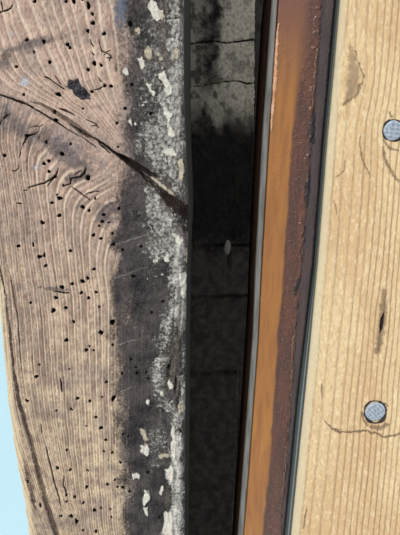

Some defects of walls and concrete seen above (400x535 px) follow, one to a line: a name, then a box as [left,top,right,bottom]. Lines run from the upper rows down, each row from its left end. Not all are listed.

crack [191,38,254,46]
crack [0,94,189,231]
peeling [122,0,188,535]